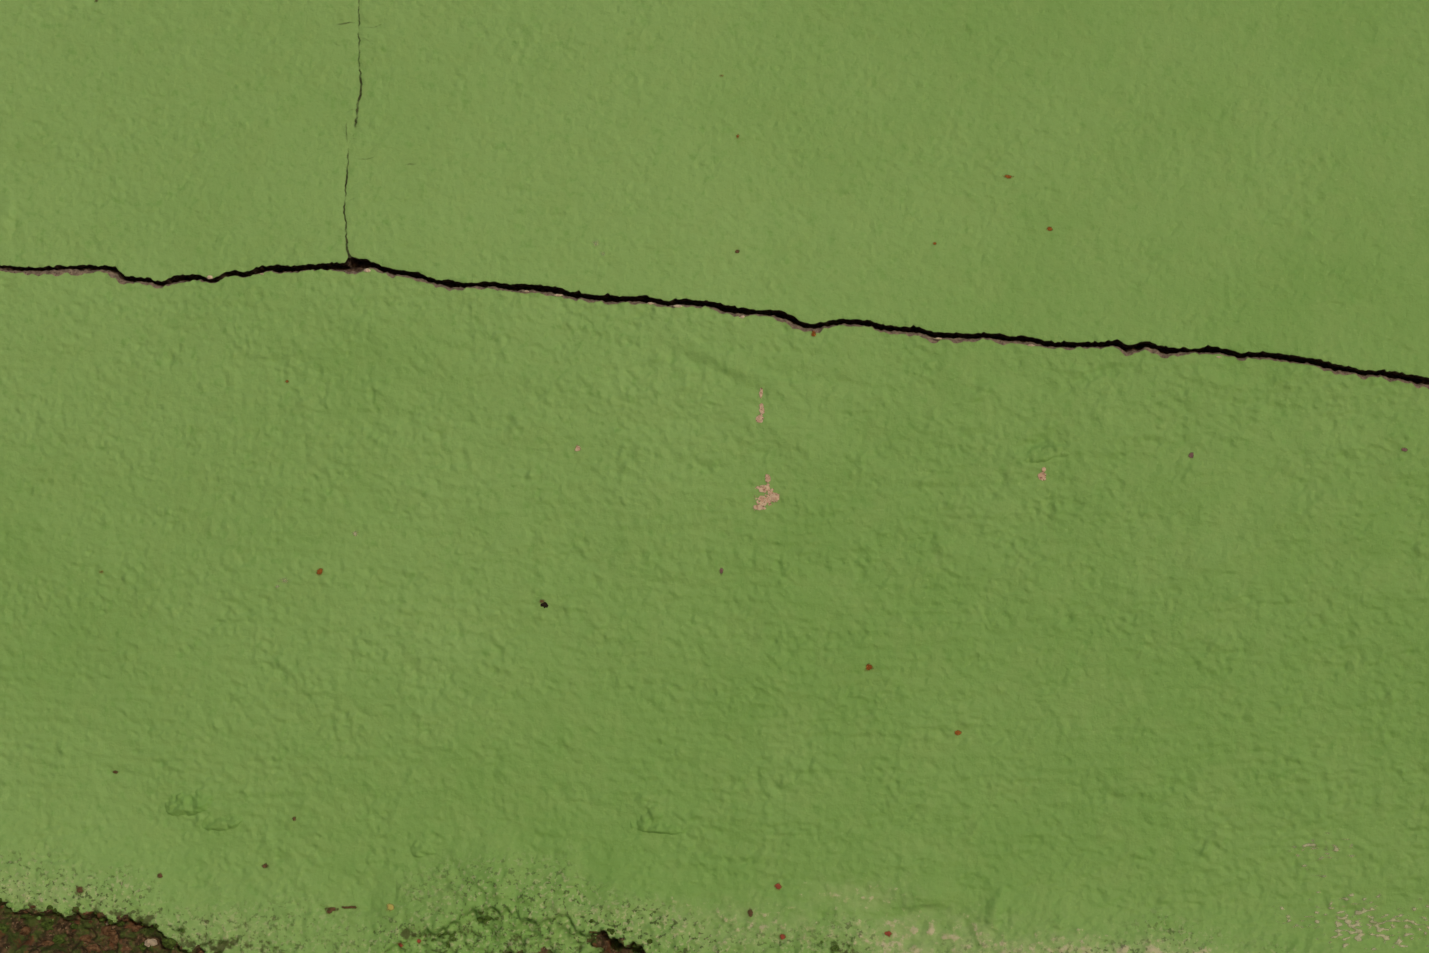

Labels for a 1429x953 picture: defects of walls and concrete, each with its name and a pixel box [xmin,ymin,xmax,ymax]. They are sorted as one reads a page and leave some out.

crack [0,9,1429,389]
peeling [753,474,780,511]
spalling [0,898,222,953]
spalling [587,919,653,953]